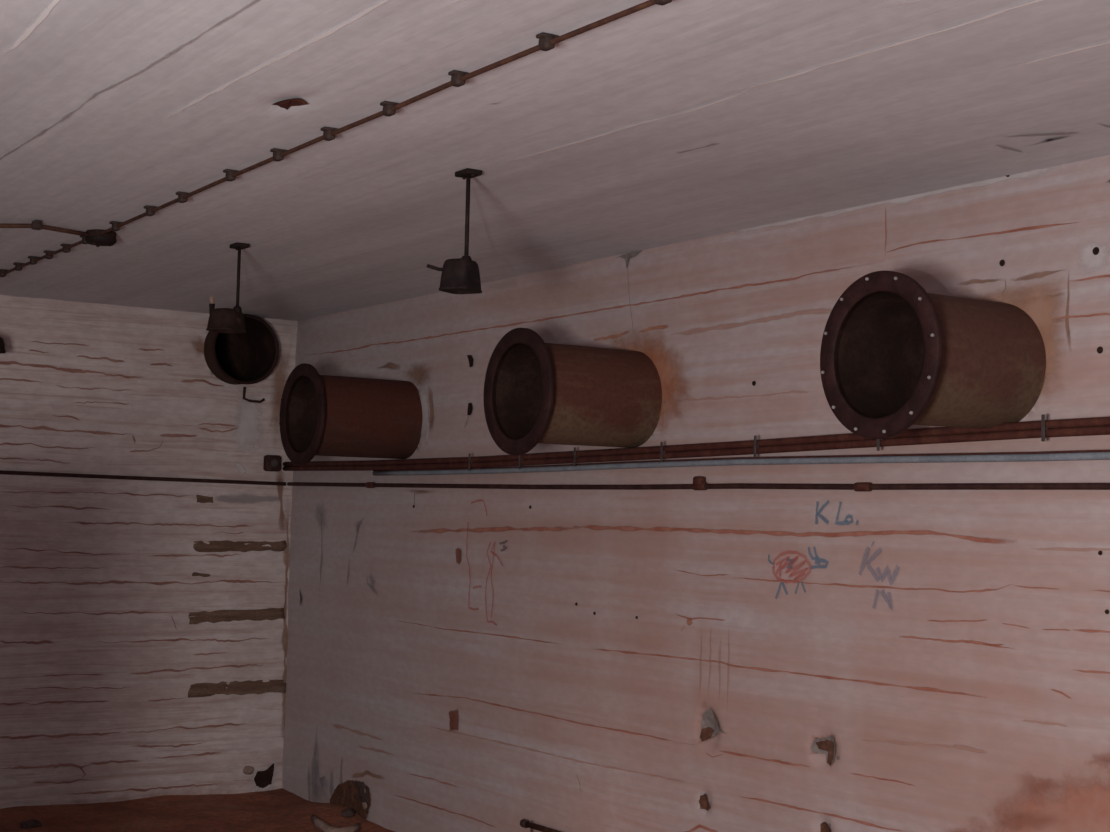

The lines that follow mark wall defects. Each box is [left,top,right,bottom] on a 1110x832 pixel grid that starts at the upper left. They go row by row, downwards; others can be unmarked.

rust [963,271,1070,377]
rust [595,325,684,418]
spalling [700,708,724,742]
spalling [810,735,840,766]
spalling [243,762,275,790]